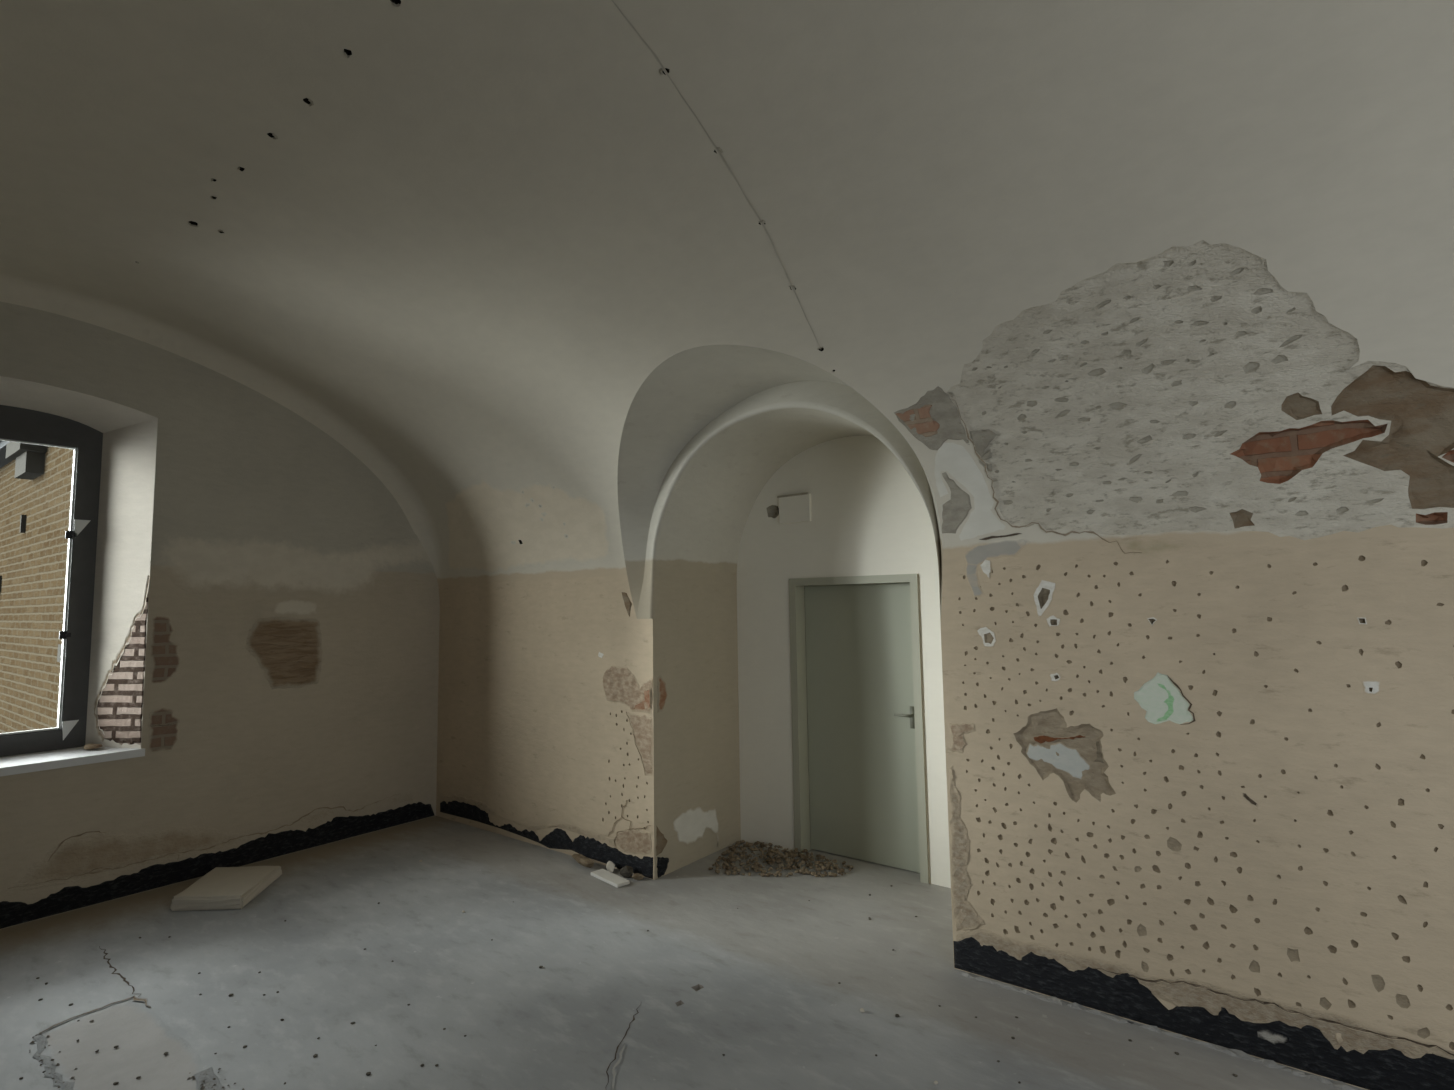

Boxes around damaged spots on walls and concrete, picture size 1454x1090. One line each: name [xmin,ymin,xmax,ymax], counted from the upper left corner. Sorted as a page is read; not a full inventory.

crack [611,0,821,349]
flaking render [894,240,1454,540]
flaking render [93,575,181,755]
flaking render [245,616,323,690]
flaking render [8,665,668,893]
flaking render [948,562,1454,1059]
crack [99,946,141,997]
crack [605,1008,639,1090]